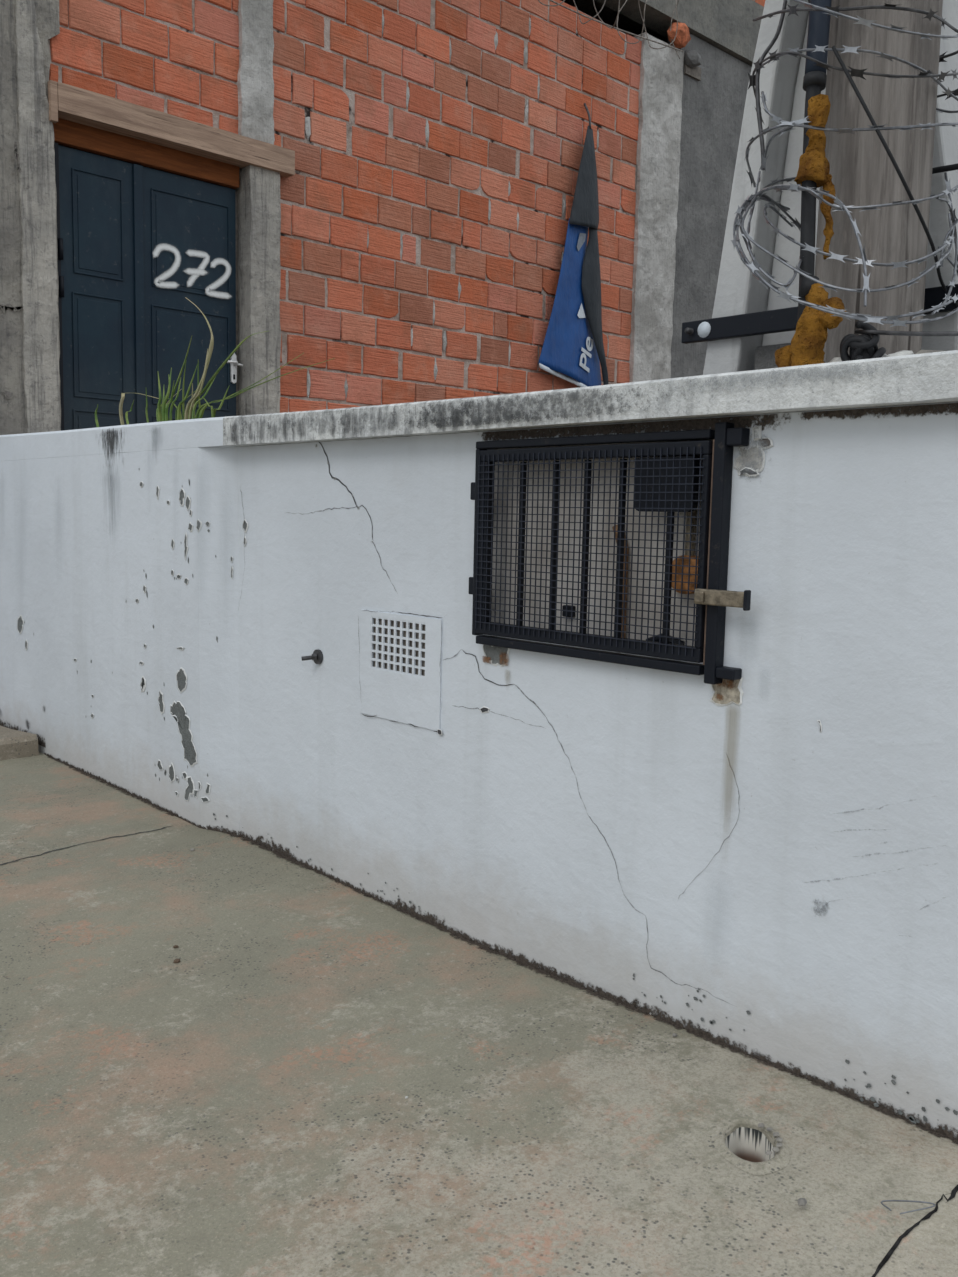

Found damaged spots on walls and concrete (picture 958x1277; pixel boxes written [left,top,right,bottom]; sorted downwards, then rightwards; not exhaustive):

water stain [224,387,958,441]
water stain [689,365,888,390]
peeling [139,480,211,585]
peeling [17,615,34,651]
peeling [139,644,228,828]
crack [293,442,724,1001]
corrosion [710,677,744,706]
crack [0,826,170,865]
water stain [0,720,958,1144]
crack [872,1185,958,1277]